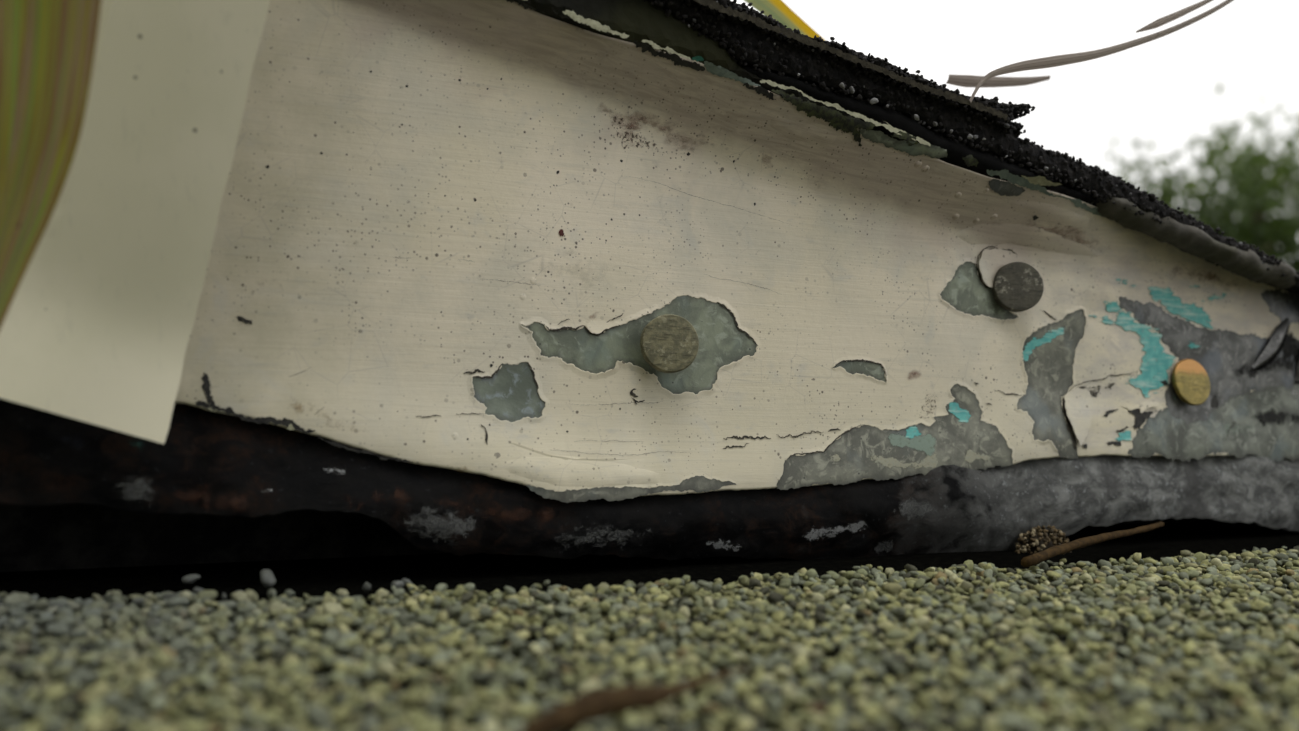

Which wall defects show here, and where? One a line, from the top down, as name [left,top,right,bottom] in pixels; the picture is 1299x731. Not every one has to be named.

peeling [467,289,761,428]
peeling [526,473,736,503]
peeling [831,356,888,385]
peeling [776,380,1015,490]
peeling [936,248,1095,459]
peeling [1119,288,1299,462]